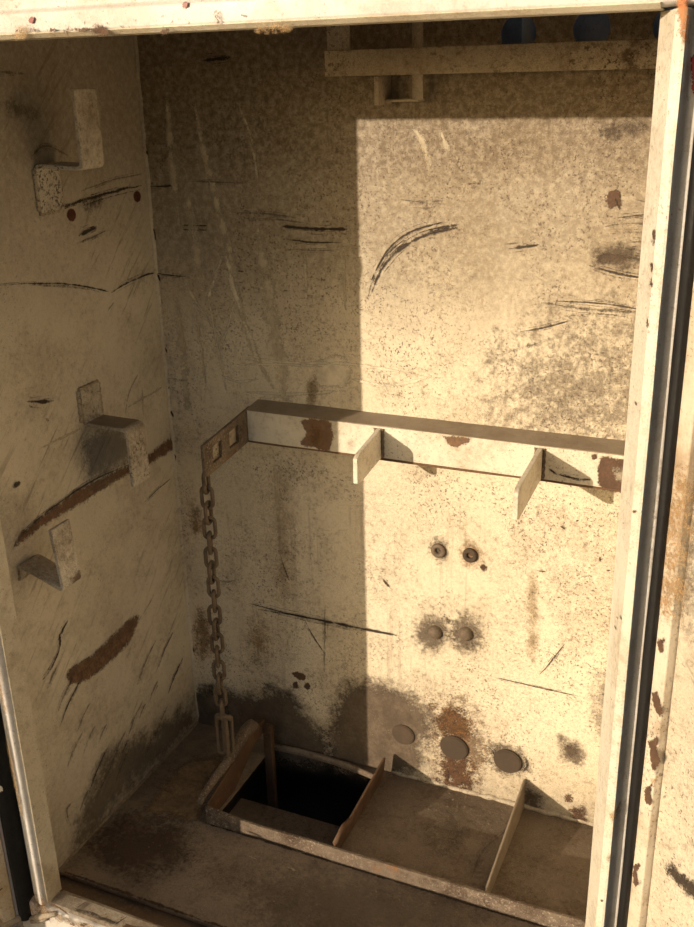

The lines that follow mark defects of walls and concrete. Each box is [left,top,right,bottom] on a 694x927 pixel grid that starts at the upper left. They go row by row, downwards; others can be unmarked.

rust [301,417,334,451]
rust [597,456,624,493]
leakage [411,609,484,651]
rust [427,693,492,790]